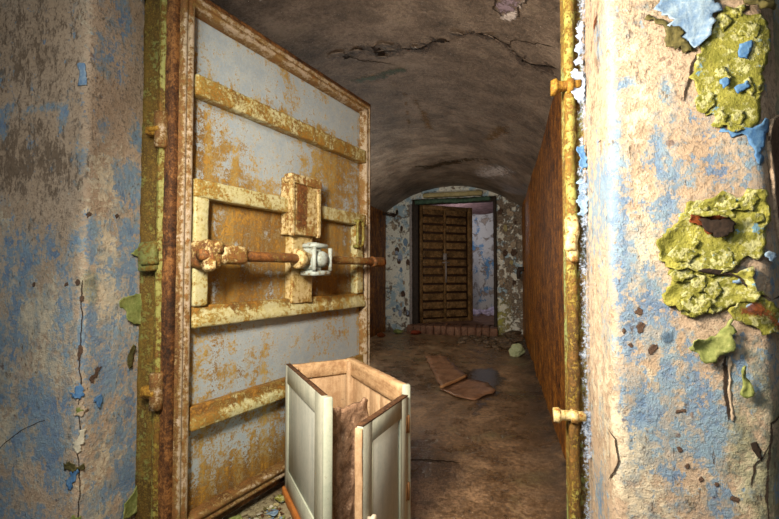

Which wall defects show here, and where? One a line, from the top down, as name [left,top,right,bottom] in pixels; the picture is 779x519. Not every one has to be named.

crack [328,31,556,74]
peeling [492,0,527,21]
peeling [644,0,779,364]
peeling [391,208,410,317]
peeling [570,0,593,519]
peeling [740,365,755,399]
crack [751,416,779,519]